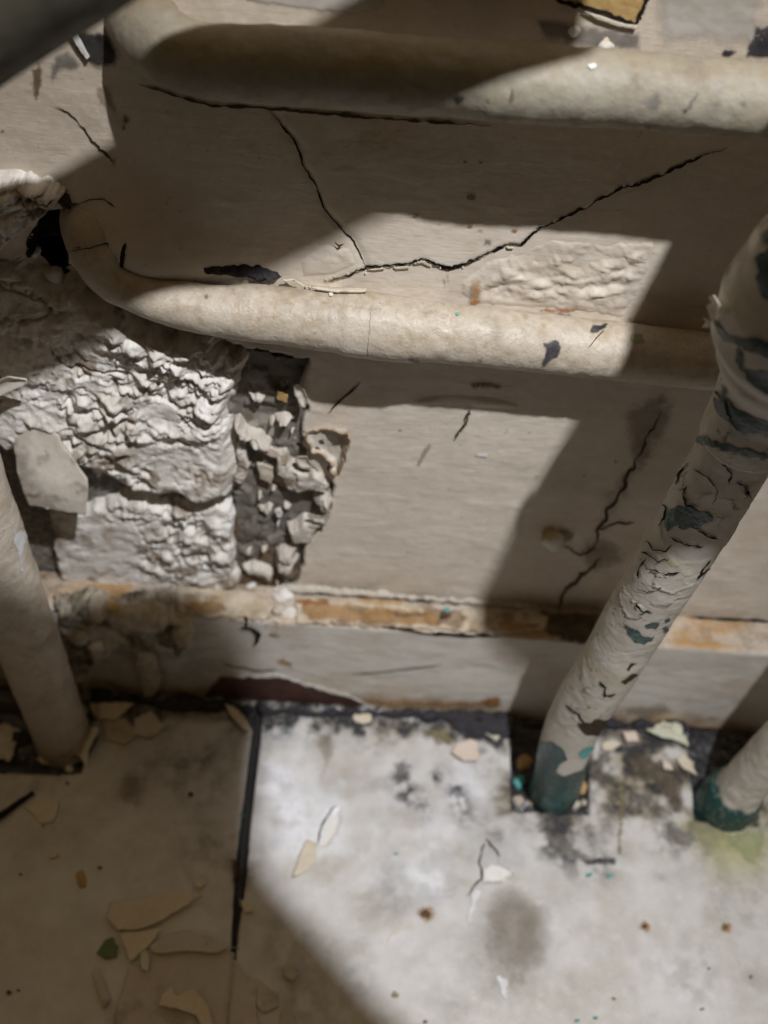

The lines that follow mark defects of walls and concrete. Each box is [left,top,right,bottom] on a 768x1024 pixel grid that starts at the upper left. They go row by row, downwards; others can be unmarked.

peeling [556,0,649,30]
crack [56,107,114,163]
crack [139,84,726,283]
peeling [713,320,768,395]
spalling [0,169,351,621]
crack [558,391,768,614]
peeling [624,618,670,644]
leakage [426,717,505,749]
peeling [578,719,698,776]
leakage [627,755,682,812]
leakage [546,786,623,878]
leakage [668,827,692,844]